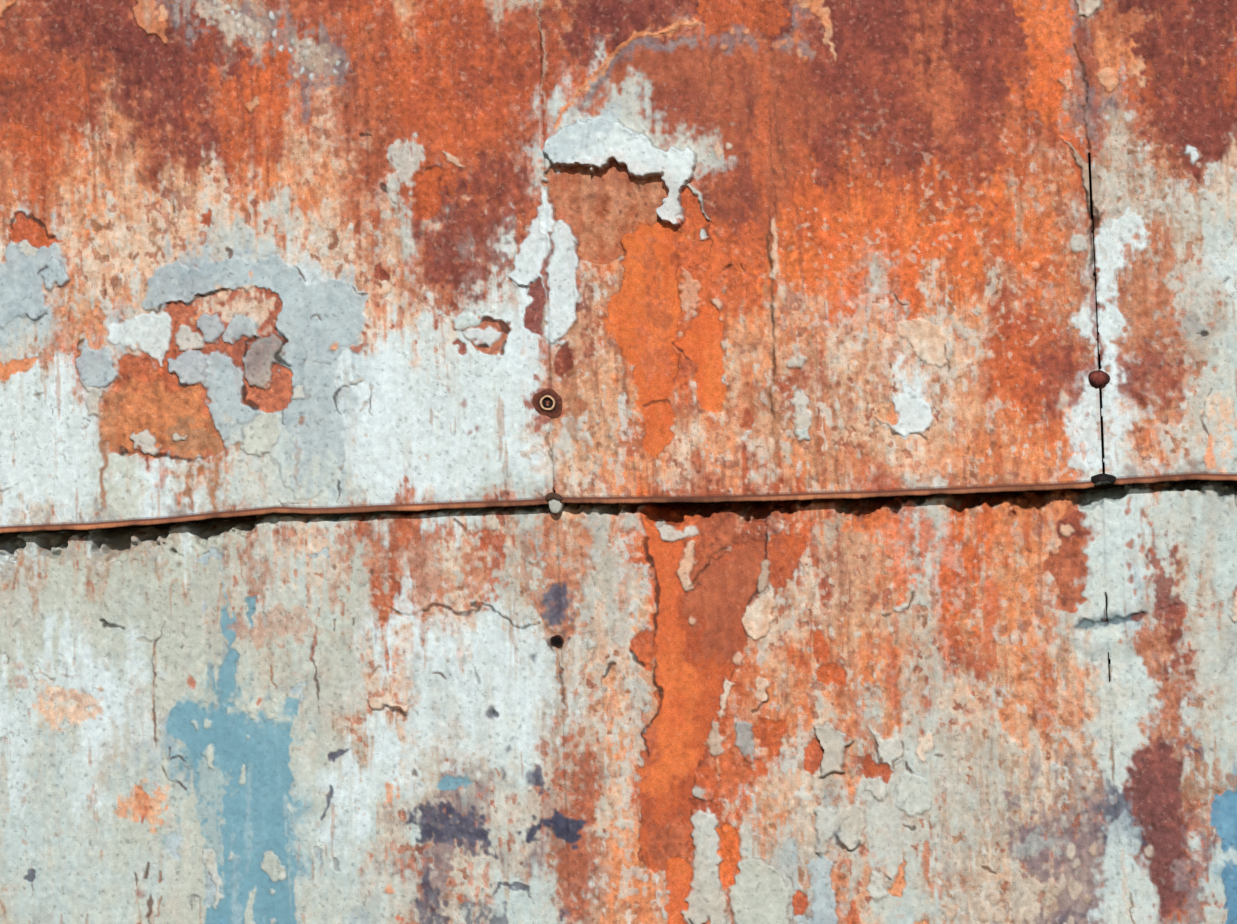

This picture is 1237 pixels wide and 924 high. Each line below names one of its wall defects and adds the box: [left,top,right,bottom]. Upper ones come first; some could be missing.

rust [559,0,1078,260]
peeling [0,209,72,329]
peeling [75,252,370,561]
rust [423,150,538,356]
peeling [506,66,769,459]
rust [1019,242,1217,430]
peeling [347,514,491,611]
crack [469,602,529,629]
peeling [630,504,1107,924]
rust [1041,510,1091,613]
crack [1101,609,1146,624]
rust [1121,496,1206,924]